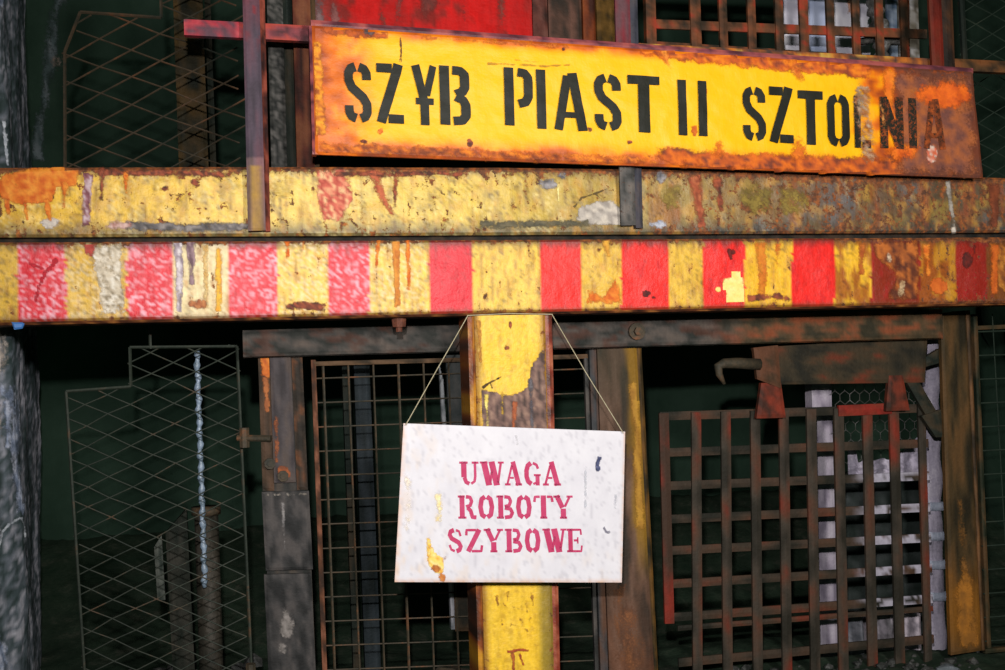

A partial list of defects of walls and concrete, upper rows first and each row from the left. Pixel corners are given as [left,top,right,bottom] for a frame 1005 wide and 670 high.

rust [314,0,978,228]
rust [0,167,78,221]
rust [97,169,232,193]
spalling [539,173,566,190]
spalling [577,201,620,225]
peeling [715,271,744,302]
rust [858,240,947,300]
rust [963,245,976,269]
rust [989,243,1005,294]
peeling [482,351,547,429]
rust [260,357,290,478]